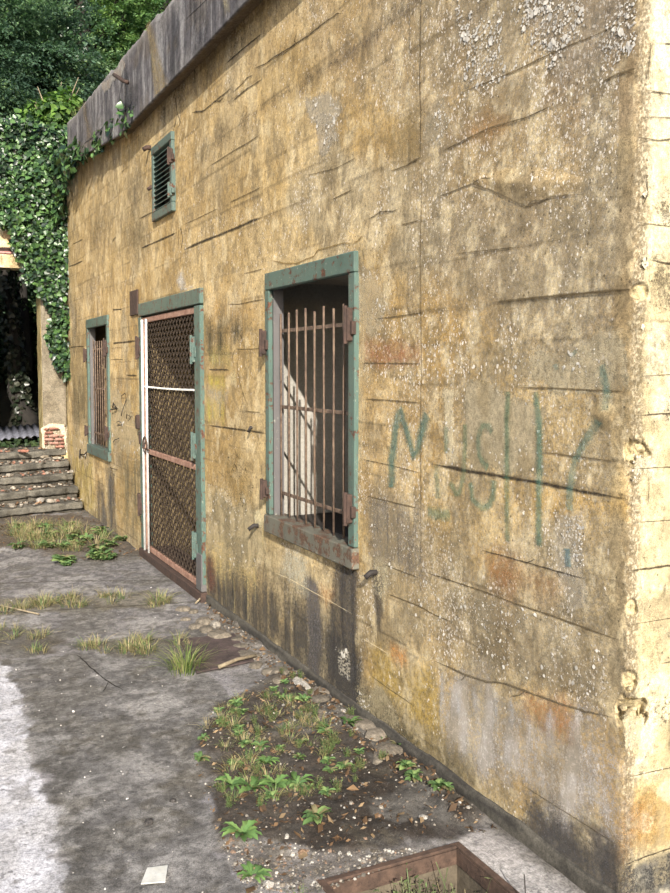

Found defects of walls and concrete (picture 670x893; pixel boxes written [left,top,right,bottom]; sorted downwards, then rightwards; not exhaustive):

crack [438,177,579,207]
water stain [649,256,670,311]
water stain [206,554,417,747]
spalling [383,509,652,747]
water stain [441,669,670,893]